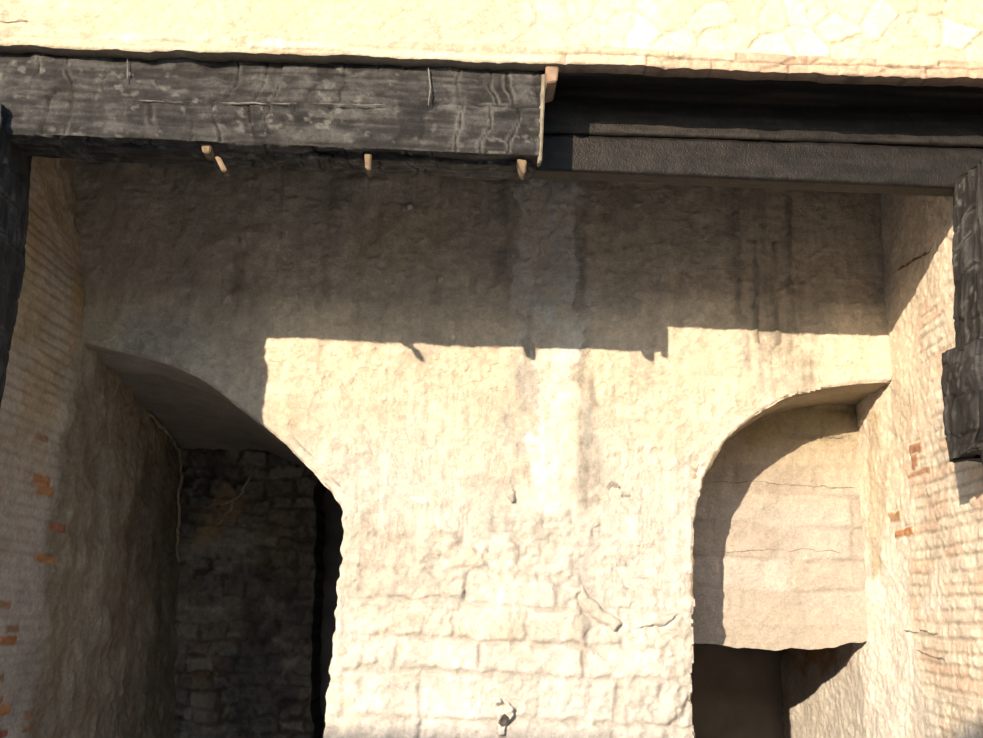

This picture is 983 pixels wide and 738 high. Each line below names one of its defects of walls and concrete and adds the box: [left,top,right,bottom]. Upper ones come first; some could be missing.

water stain [464,178,624,599]
water stain [718,187,892,586]